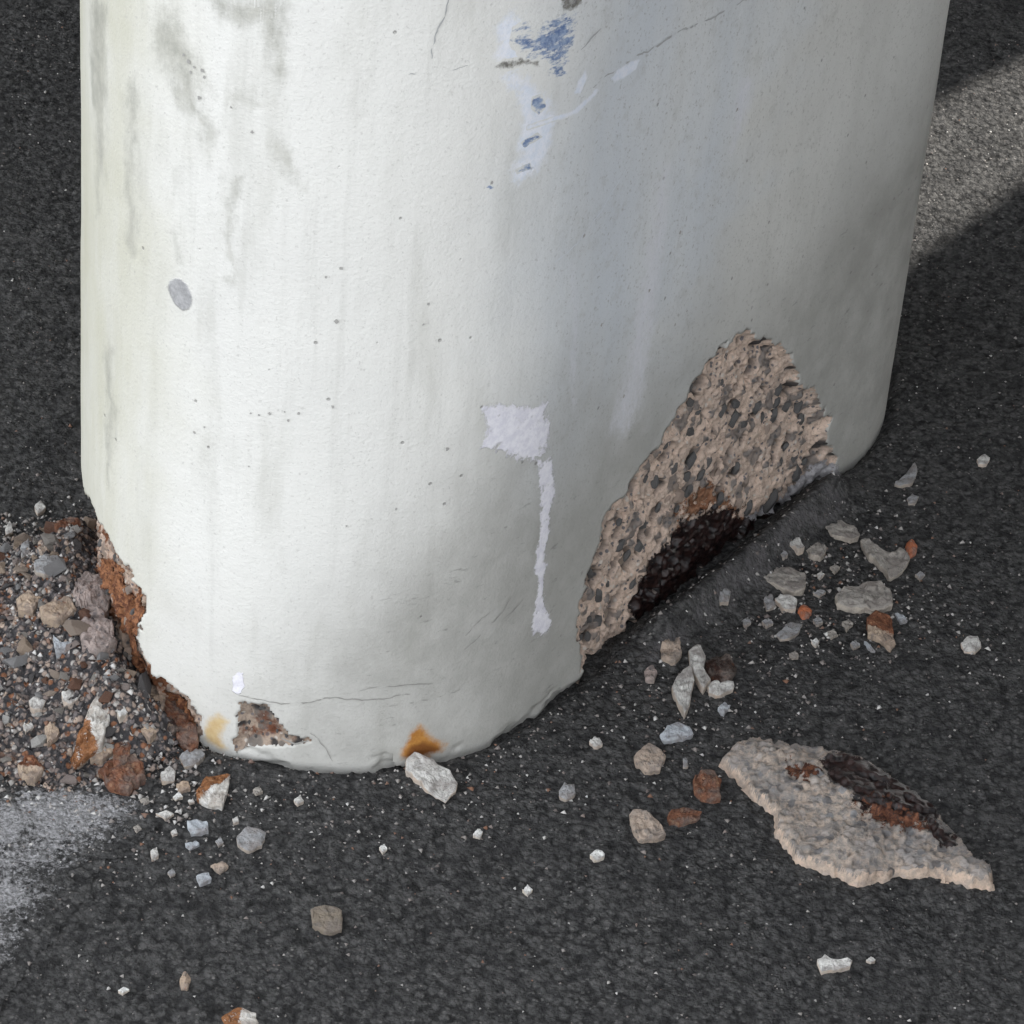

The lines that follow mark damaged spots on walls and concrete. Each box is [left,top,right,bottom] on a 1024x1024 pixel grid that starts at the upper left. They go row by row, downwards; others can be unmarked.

corrosion [96,557,151,682]
corrosion [627,479,780,621]
spalling [575,330,841,685]
peeling [742,537,925,660]
spalling [94,519,230,851]
spalling [231,671,311,752]
crack [239,682,455,706]
corrosion [393,719,454,767]